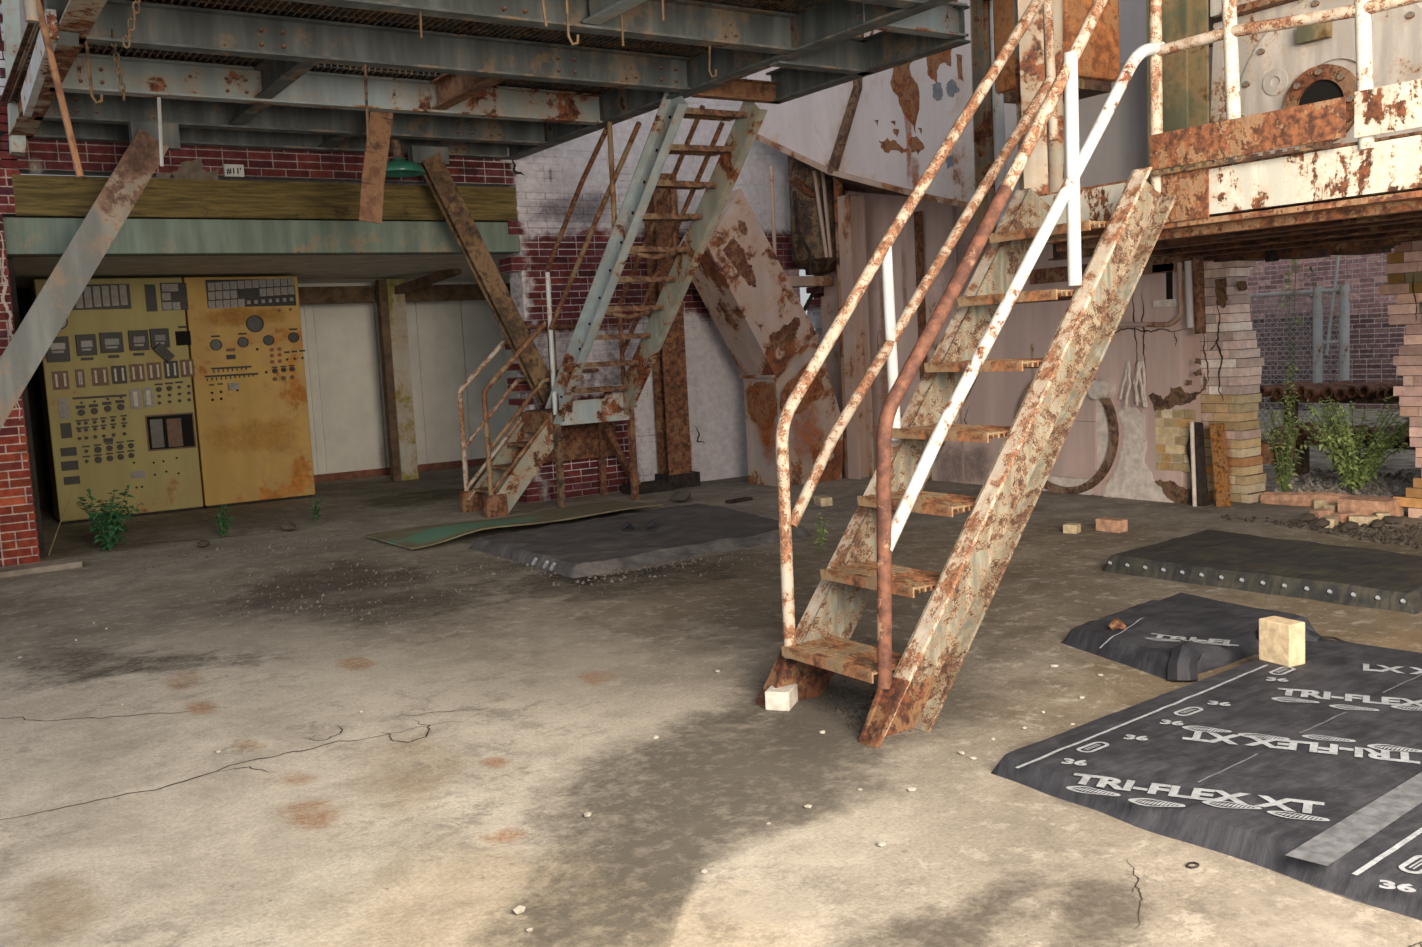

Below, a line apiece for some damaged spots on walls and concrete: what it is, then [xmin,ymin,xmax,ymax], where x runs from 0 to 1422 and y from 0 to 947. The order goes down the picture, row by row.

crack [0,708,486,820]
damp [493,672,893,947]